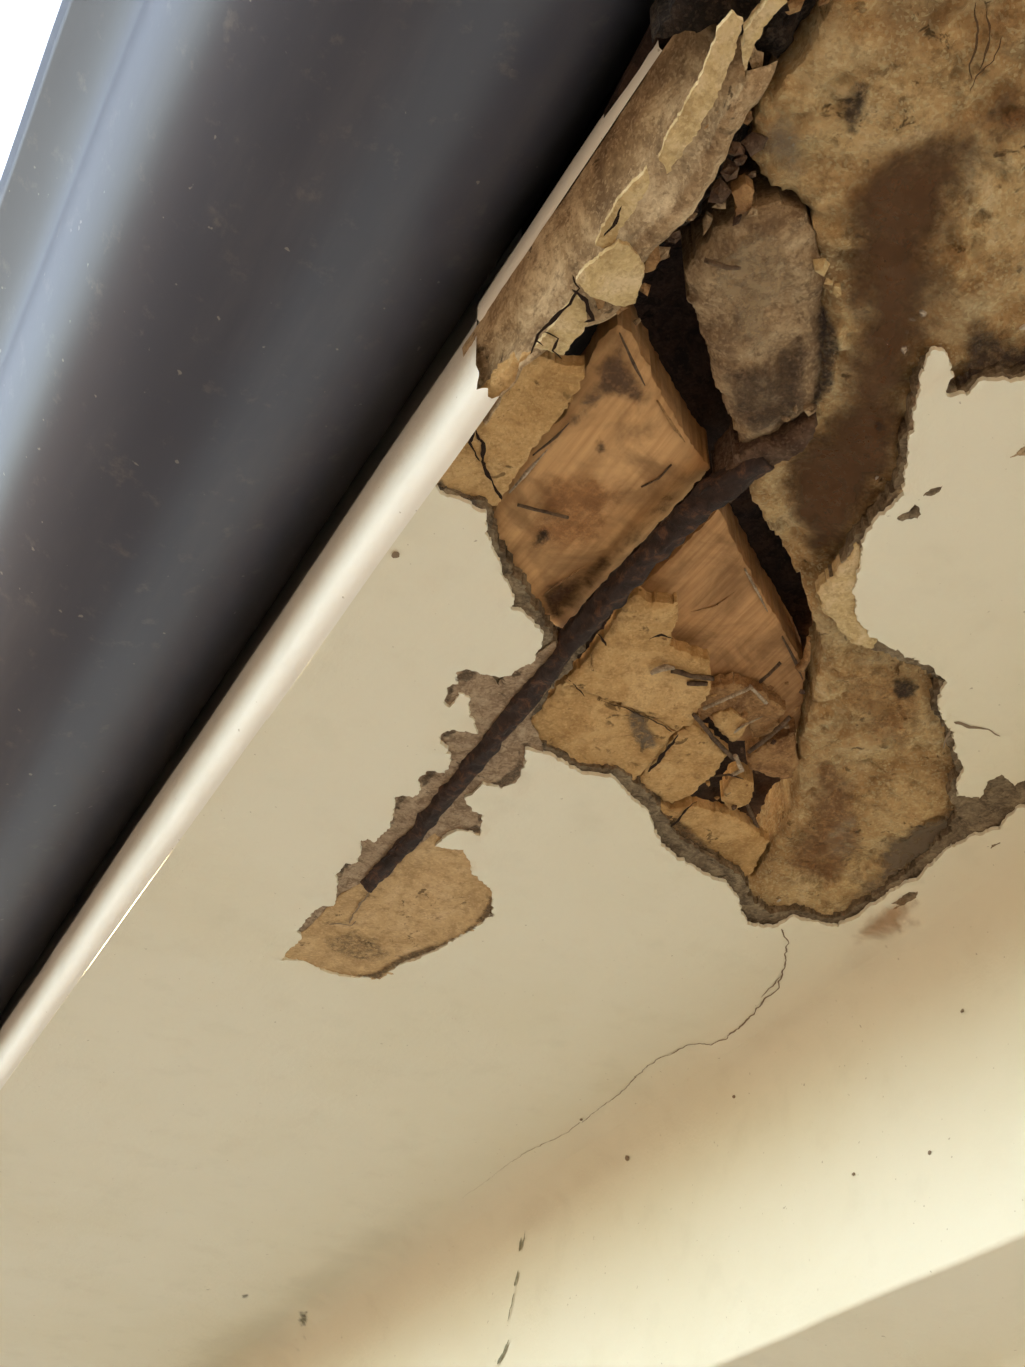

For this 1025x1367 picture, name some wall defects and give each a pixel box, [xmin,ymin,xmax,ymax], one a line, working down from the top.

corrosion [360,457,774,893]
spalling [285,0,1025,980]
crack [464,929,789,1197]